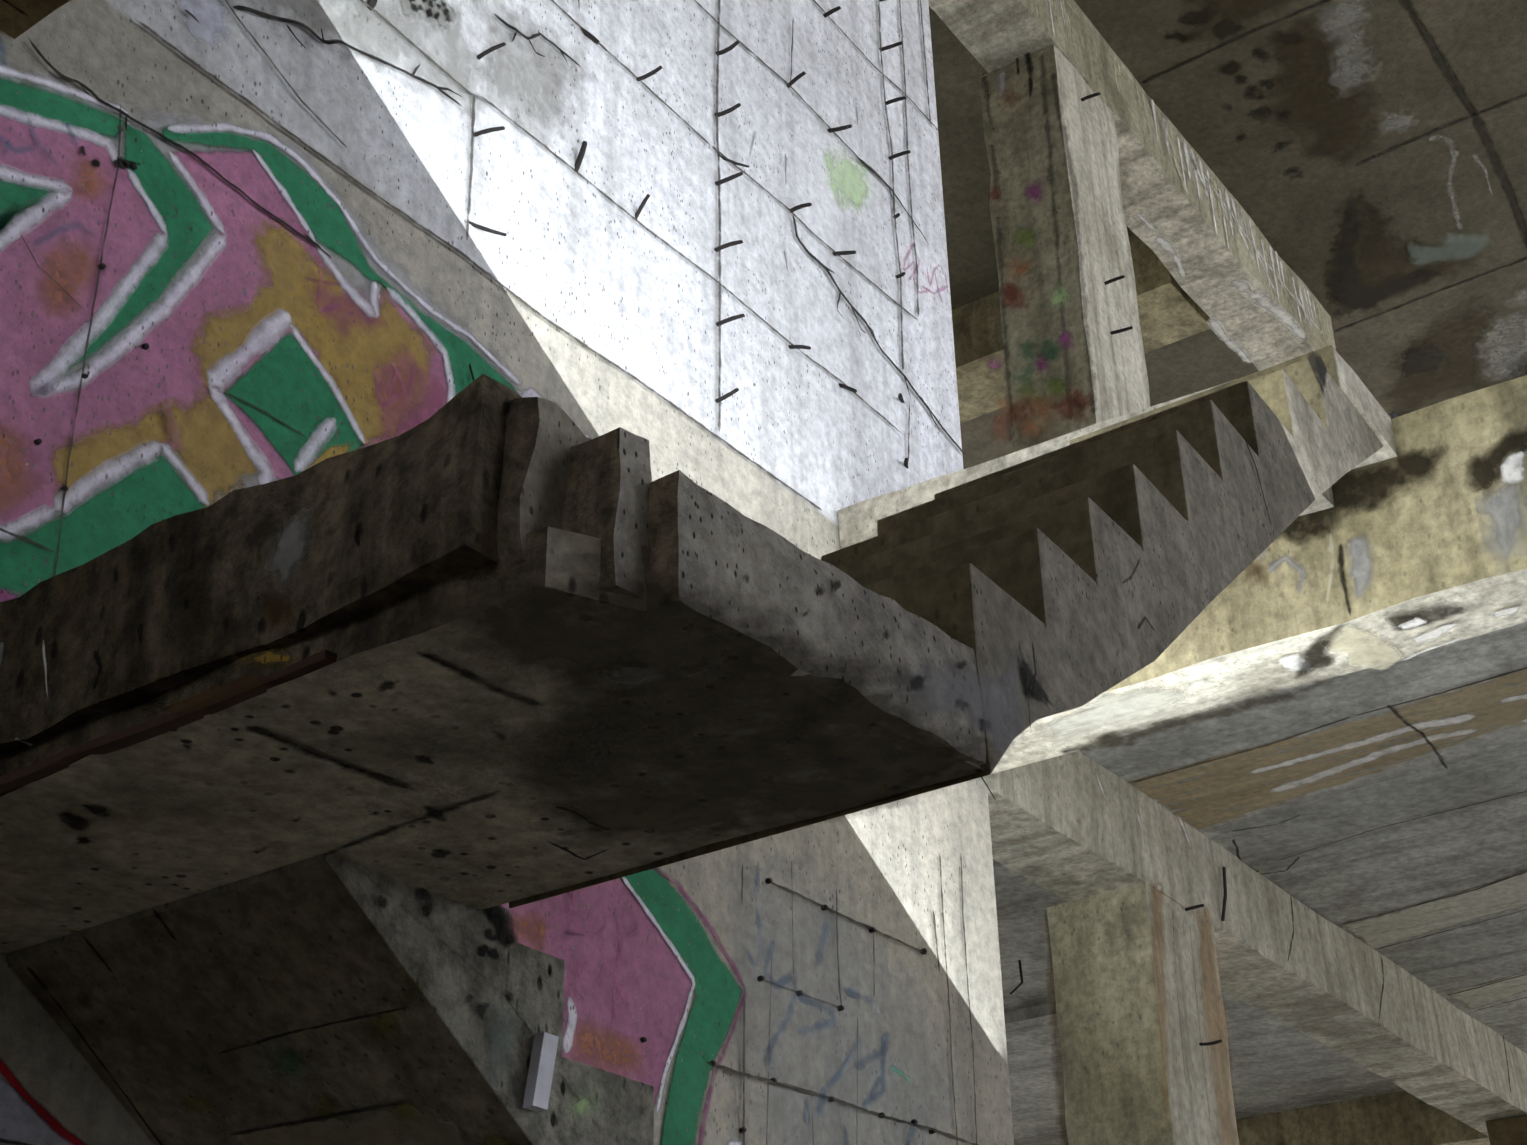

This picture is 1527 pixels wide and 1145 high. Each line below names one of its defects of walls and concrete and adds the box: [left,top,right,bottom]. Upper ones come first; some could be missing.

crack [233,6,462,106]
crack [494,14,581,67]
water stain [1165,0,1288,42]
water stain [1220,0,1411,161]
water stain [1016,52,1096,417]
water stain [1137,86,1478,394]
water stain [1430,135,1492,229]
crack [793,215,965,454]
water stain [1468,430,1527,558]
water stain [1051,450,1465,752]
water stain [1493,607,1519,617]